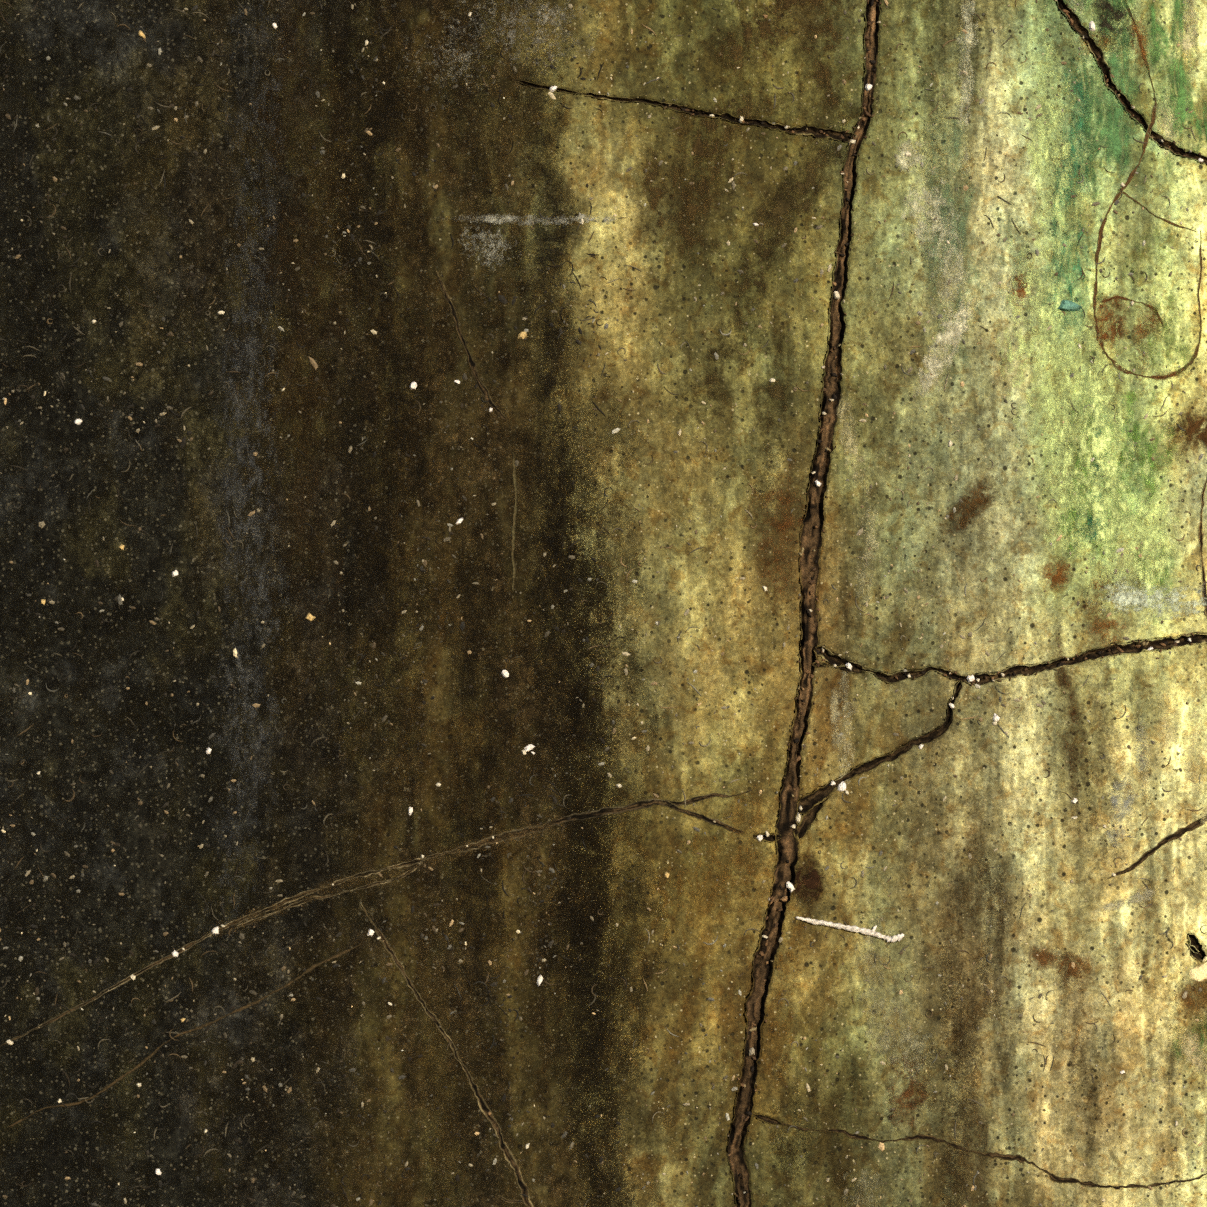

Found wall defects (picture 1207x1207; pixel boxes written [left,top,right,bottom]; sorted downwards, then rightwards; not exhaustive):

water stain [0,0,648,1207]
crack [512,0,1207,1207]
rust [949,480,995,531]
rust [1096,298,1161,342]